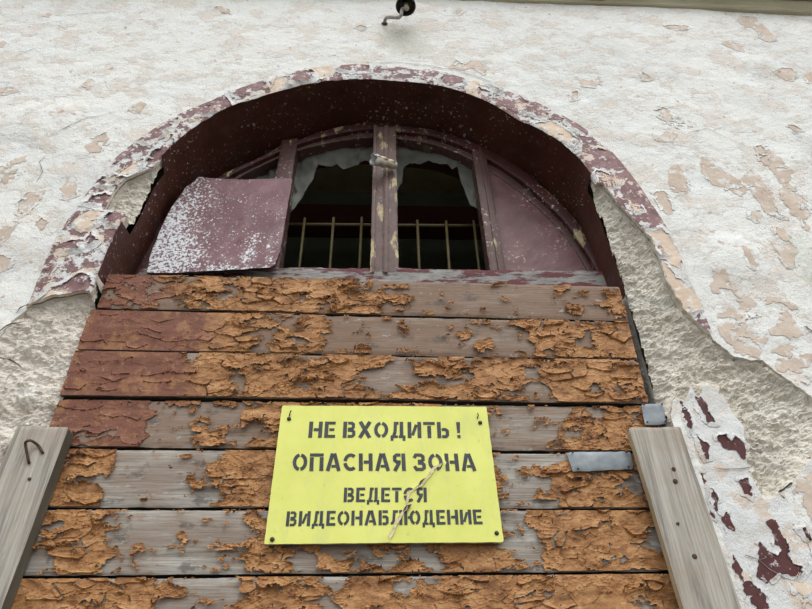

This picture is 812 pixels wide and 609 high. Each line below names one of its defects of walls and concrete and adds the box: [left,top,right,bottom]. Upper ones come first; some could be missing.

peeling [0,155,27,184]
flaking render [50,111,216,256]
peeling [128,101,147,113]
peeling [0,164,812,609]